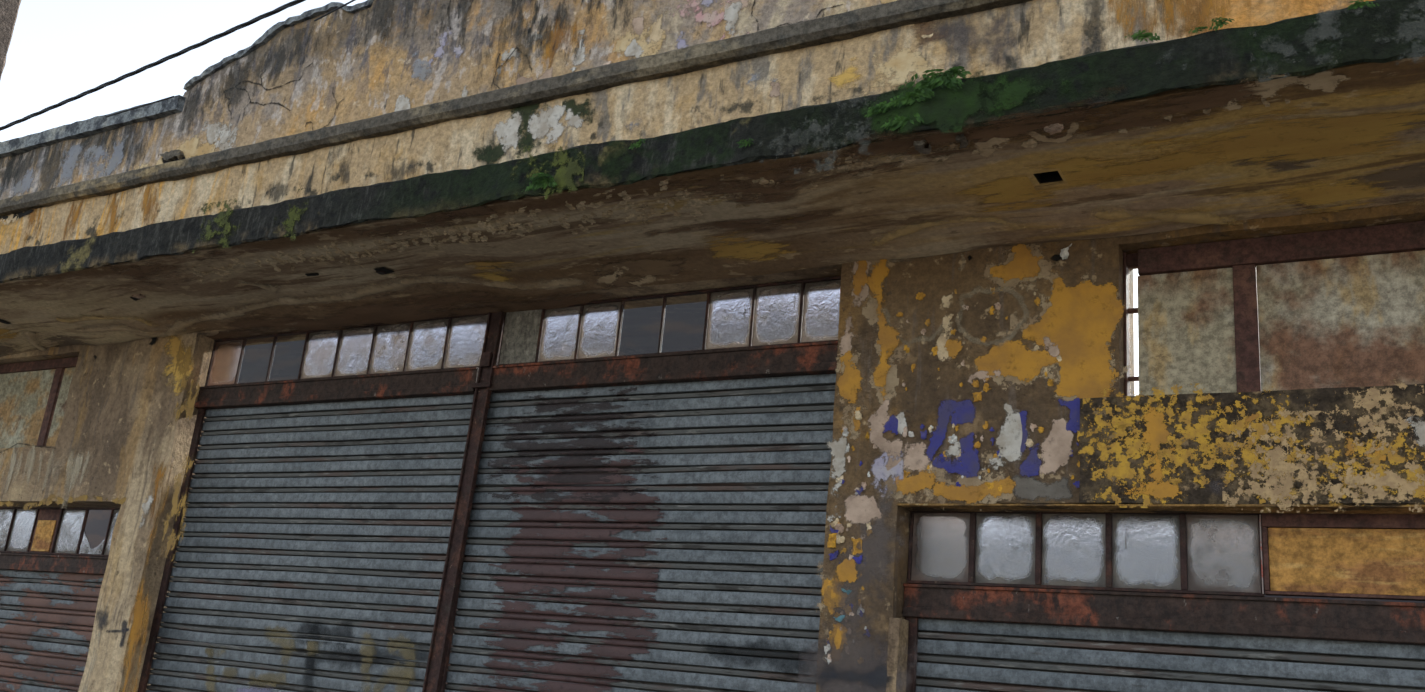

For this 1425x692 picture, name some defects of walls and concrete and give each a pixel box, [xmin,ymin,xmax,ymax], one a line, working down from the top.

water stain [1,123,151,191]
water stain [269,184,287,202]
water stain [391,162,416,178]
water stain [355,205,496,241]
water stain [473,94,595,164]
peeling [330,174,779,278]
peeling [705,232,796,261]
peeling [811,243,1425,664]